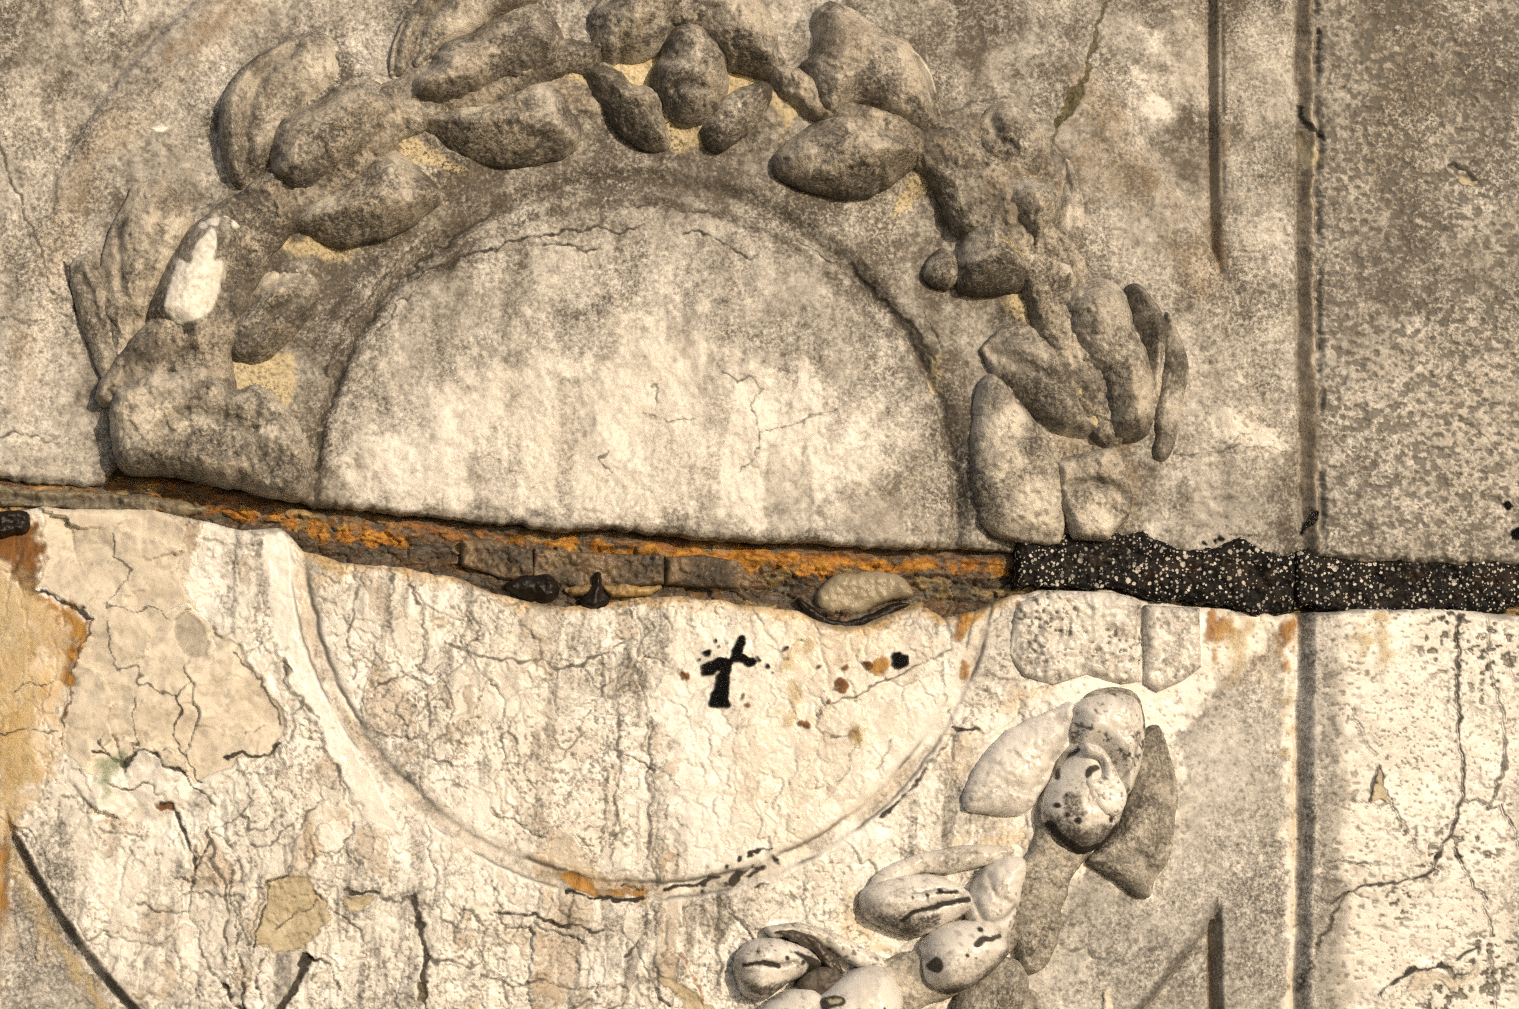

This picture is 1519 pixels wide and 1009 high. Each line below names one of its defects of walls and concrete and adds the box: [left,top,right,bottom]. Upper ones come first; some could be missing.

crack [1052,0,1111,153]
corrosion [0,844,8,911]
corrosion [0,523,86,686]
spalling [34,506,287,783]
crack [91,649,354,962]
spalling [137,801,381,1009]
crack [346,565,680,1009]
corrosion [545,535,1010,580]
crack [825,649,983,818]
corrosion [961,660,970,679]
corrosion [954,612,981,640]
crack [1295,614,1519,1009]